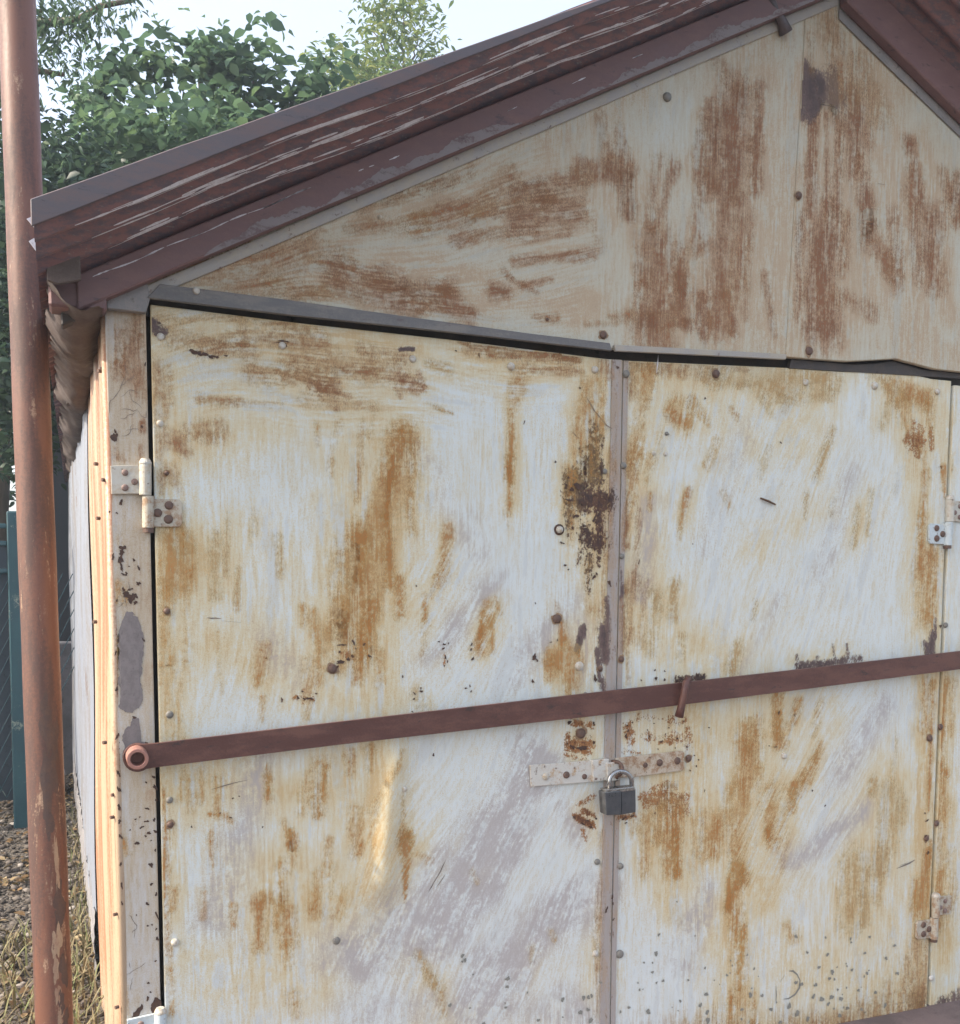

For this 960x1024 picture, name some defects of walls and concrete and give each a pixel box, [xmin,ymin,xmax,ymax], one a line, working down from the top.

peeling [93,123,522,277]
peeling [75,0,715,248]
rust [612,83,764,347]
rust [795,15,901,358]
peeling [116,545,148,758]
rust [300,423,416,687]
rust [564,719,596,760]
rust [572,795,597,842]
rust [531,361,652,693]
rust [618,781,691,878]
rust [795,643,862,669]
rust [879,377,937,628]